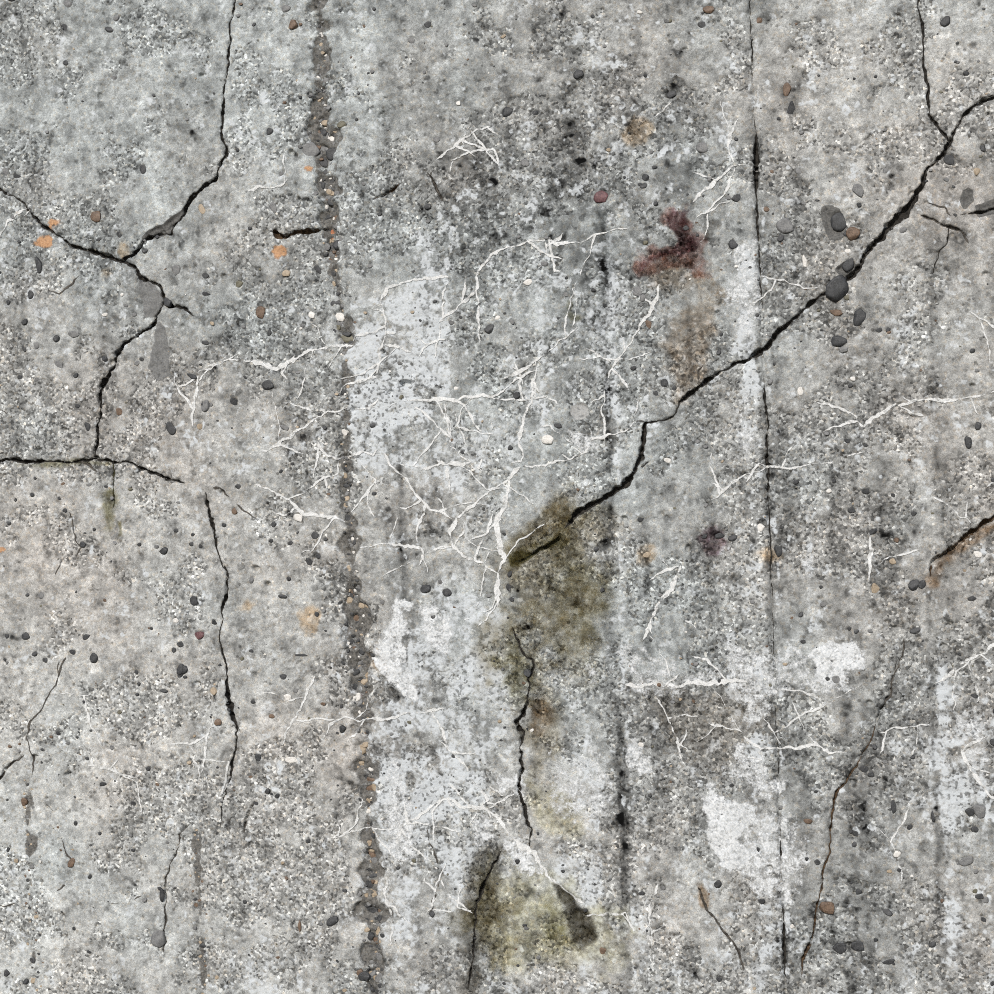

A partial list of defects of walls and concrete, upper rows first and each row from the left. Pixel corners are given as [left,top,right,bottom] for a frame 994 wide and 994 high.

crack [846,0,994,281]
efflorescence [719,239,762,338]
crack [0,0,255,831]
damp [568,430,599,452]
crack [515,294,825,562]
damp [739,391,753,452]
crack [929,515,994,576]
damp [472,814,543,876]
damp [496,774,526,796]
crack [512,627,535,847]
crack [801,640,905,977]
crack [468,851,501,987]